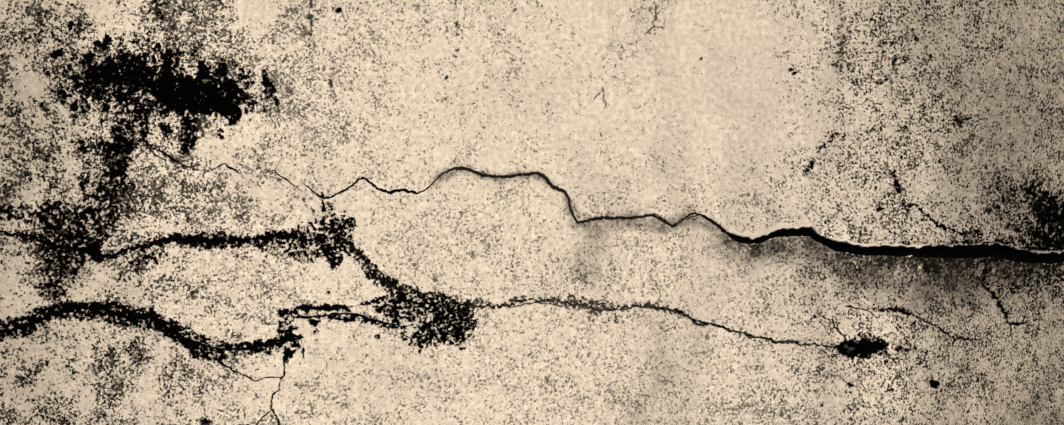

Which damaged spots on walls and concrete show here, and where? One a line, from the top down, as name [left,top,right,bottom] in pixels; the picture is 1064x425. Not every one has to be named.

crack [0,222,419,425]
crack [138,137,1064,348]
crack [803,125,885,176]